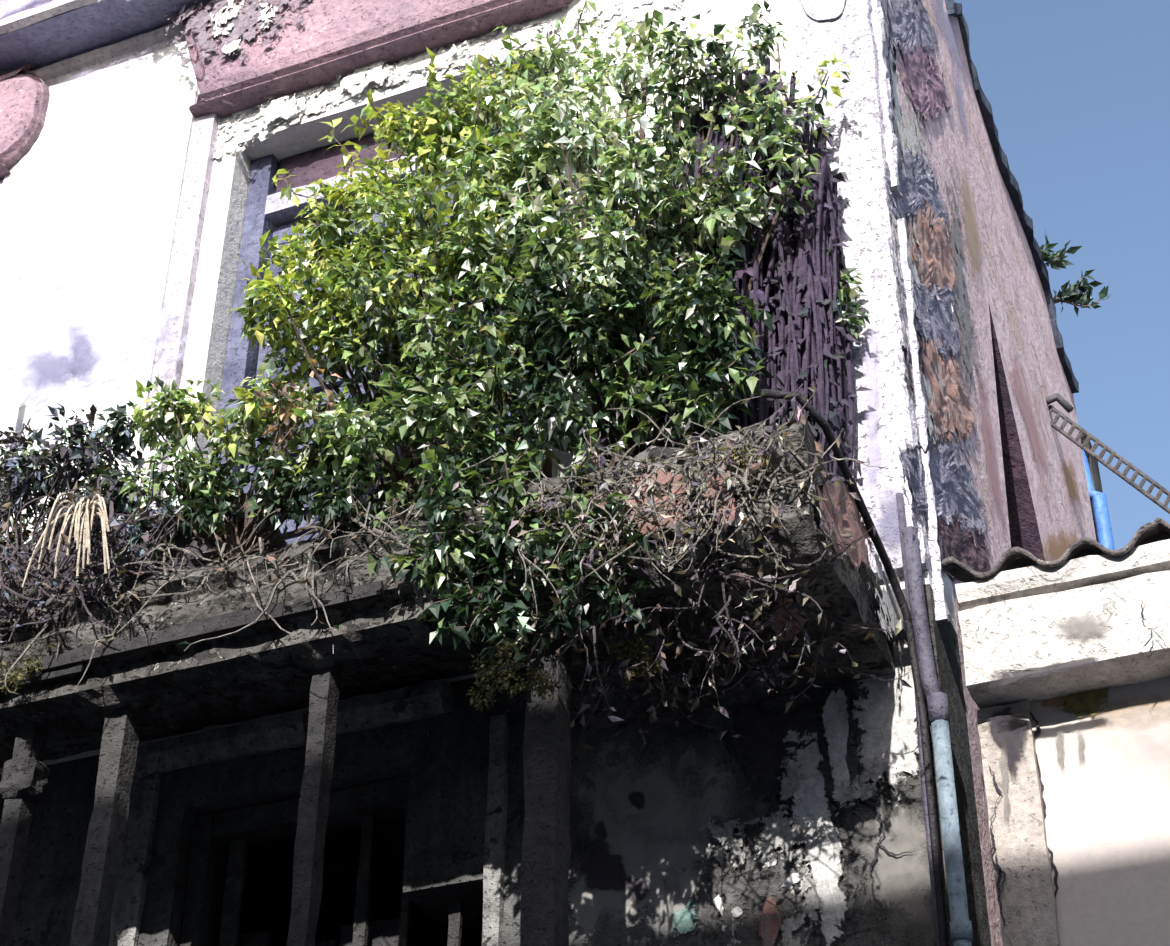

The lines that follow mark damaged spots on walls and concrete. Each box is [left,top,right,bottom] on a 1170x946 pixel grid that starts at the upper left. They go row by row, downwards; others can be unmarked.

peeling [154,0,308,70]
flaking render [212,0,711,159]
damp [0,236,193,425]
flaking render [868,0,994,584]
damp [1058,614,1104,637]
crack [1140,599,1169,660]
flaking render [700,470,927,946]
damp [989,707,1027,817]
crack [1030,712,1046,817]
damp [1056,731,1064,765]
crack [1048,848,1059,898]